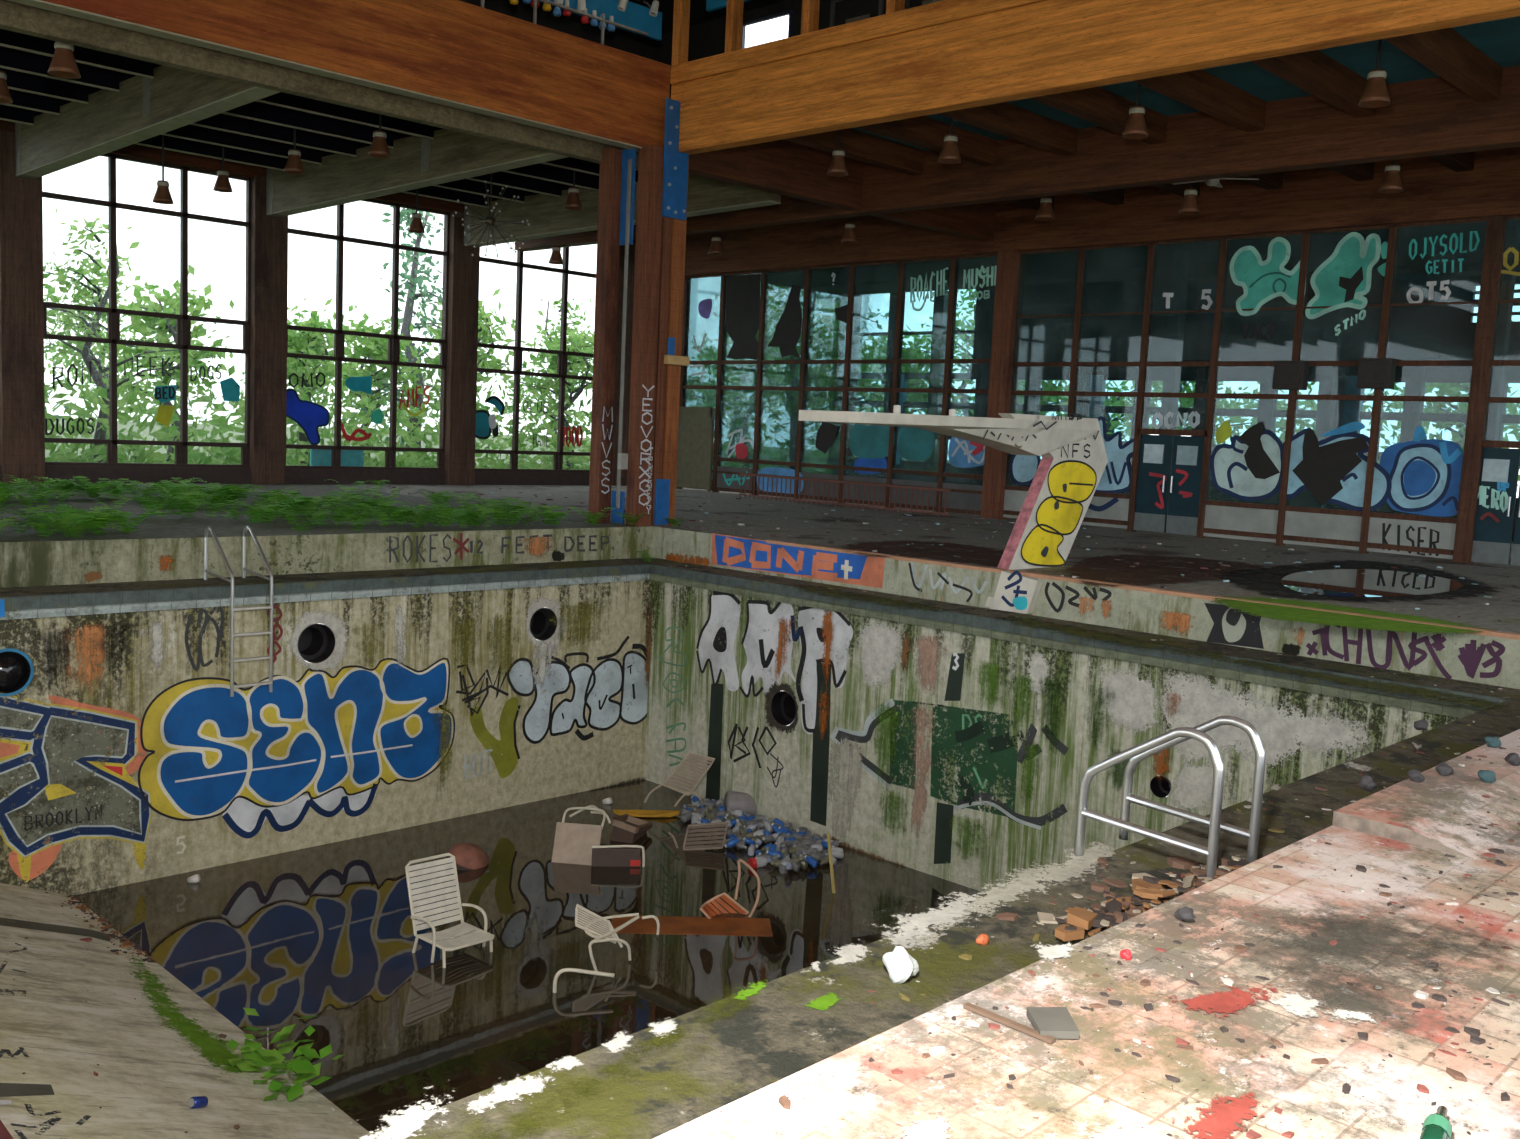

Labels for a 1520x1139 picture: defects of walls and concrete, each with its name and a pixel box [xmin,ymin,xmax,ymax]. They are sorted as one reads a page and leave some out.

water stain [1065,554,1499,603]
water stain [39,628,69,678]
water stain [100,623,163,669]
water stain [355,623,377,667]
rust [819,610,833,738]
water stain [437,700,453,783]
water stain [874,636,946,837]
water stain [979,663,1060,806]
water stain [1088,688,1129,788]
peeling [1098,665,1382,813]
water stain [823,835,904,867]
water stain [950,816,983,859]